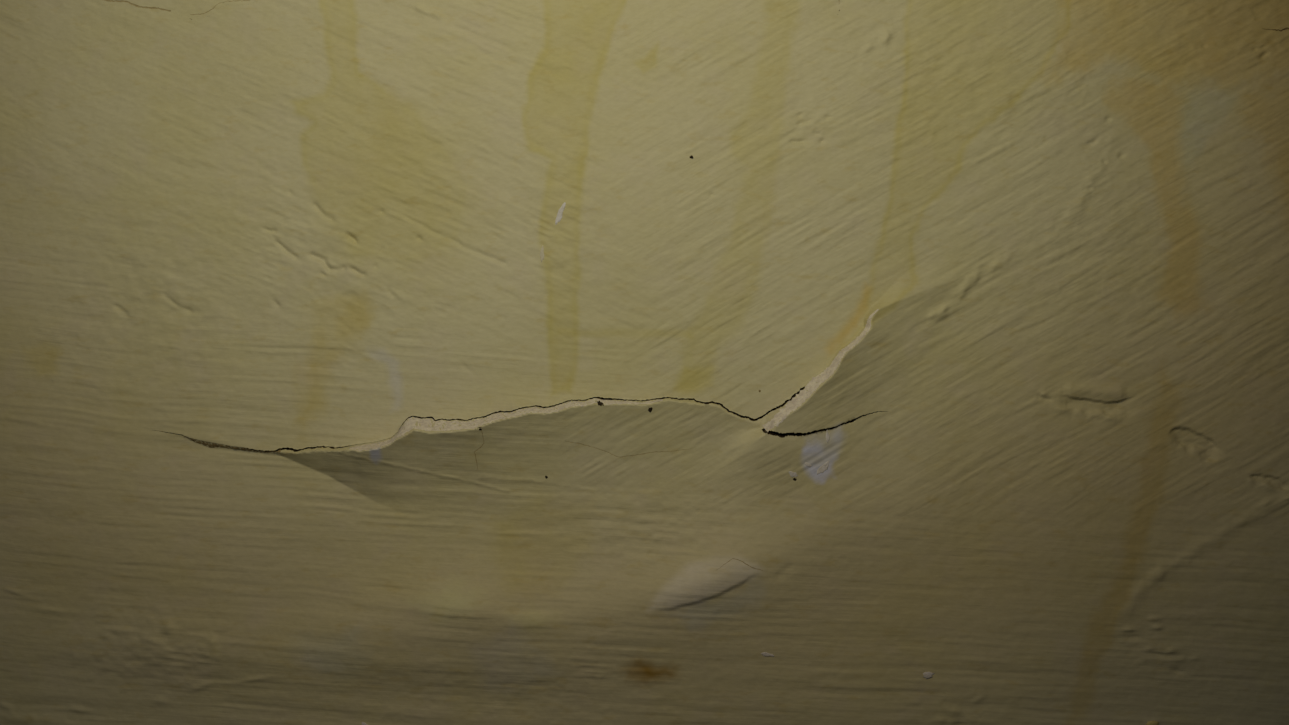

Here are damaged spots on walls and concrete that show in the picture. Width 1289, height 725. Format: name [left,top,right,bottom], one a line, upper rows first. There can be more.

crack [147,309,893,478]
water stain [520,0,805,403]